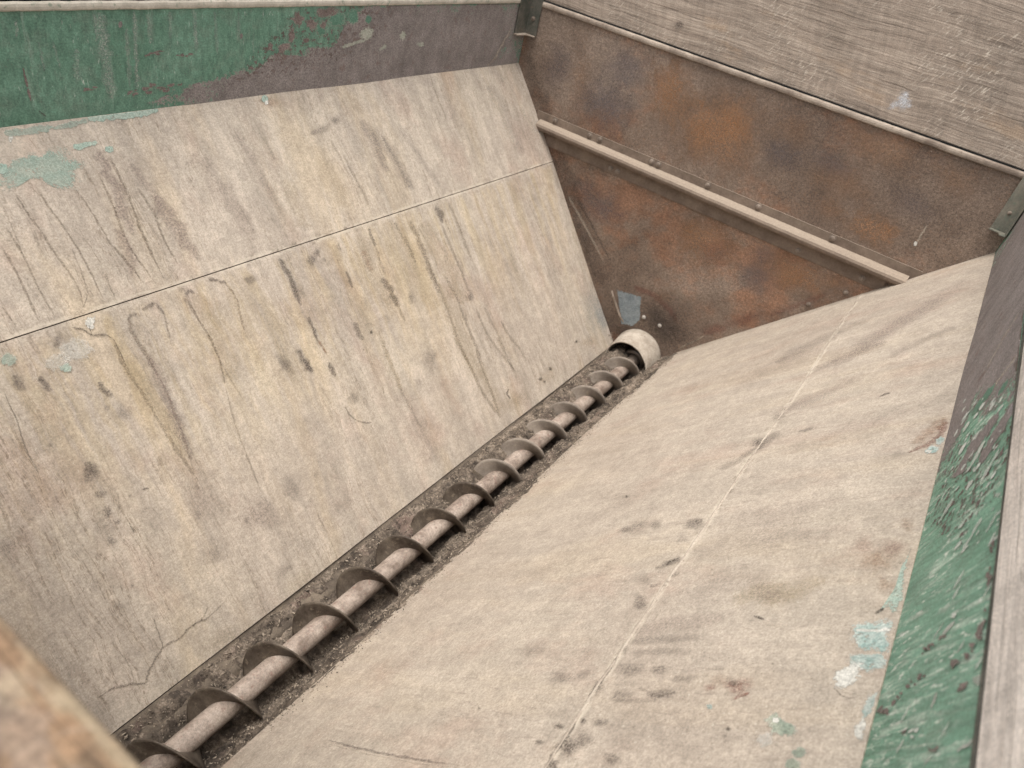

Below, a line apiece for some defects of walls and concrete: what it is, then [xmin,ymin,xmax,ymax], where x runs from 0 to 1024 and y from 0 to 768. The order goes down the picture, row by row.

peeling [87,3,524,122]
peeling [0,140,114,191]
peeling [833,549,925,740]